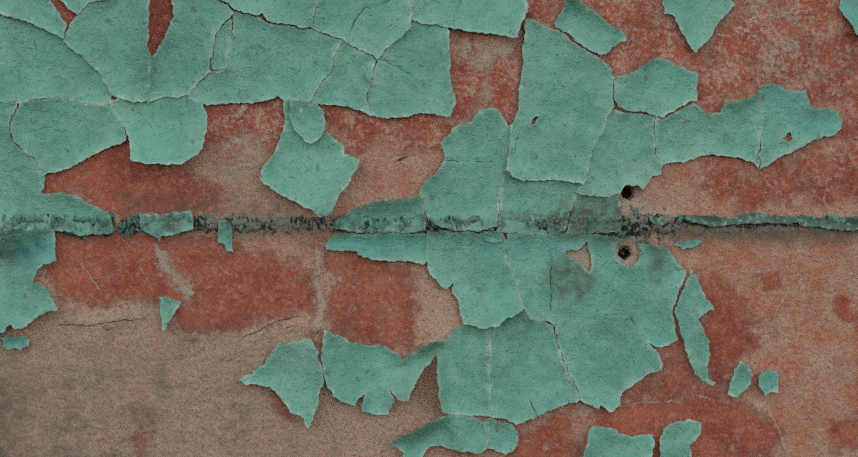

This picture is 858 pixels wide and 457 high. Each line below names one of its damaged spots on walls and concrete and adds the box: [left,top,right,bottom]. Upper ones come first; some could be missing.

crack [218,0,412,104]
peeling [0,0,858,335]
peeling [1,336,30,350]
peeling [727,361,753,397]
peeling [758,369,779,397]